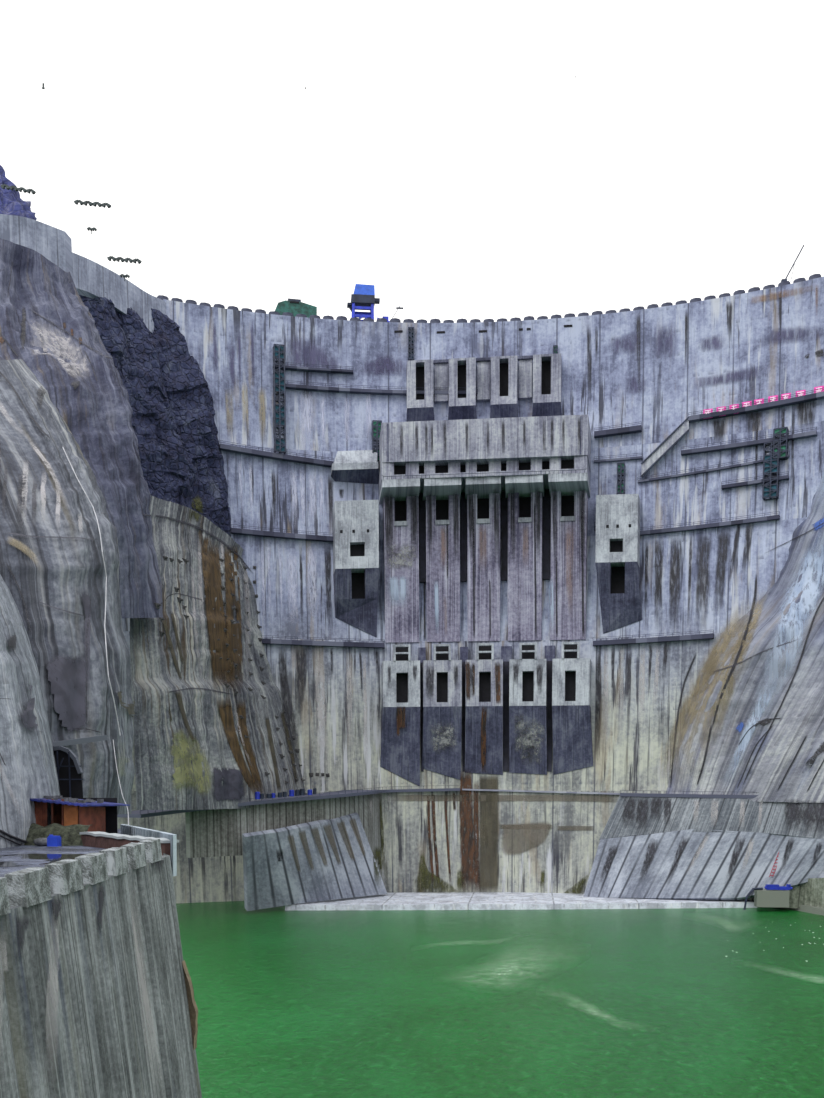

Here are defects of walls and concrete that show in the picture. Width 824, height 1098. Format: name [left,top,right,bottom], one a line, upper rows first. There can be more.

water stain [771,297,805,342]
water stain [587,331,597,385]
water stain [707,370,756,384]
water stain [713,420,724,437]
water stain [782,401,816,476]
water stain [645,526,751,606]
water stain [774,548,824,666]
water stain [413,666,434,693]
water stain [265,651,307,788]
water stain [734,695,769,760]
rust [459,662,500,887]
water stain [277,802,385,875]